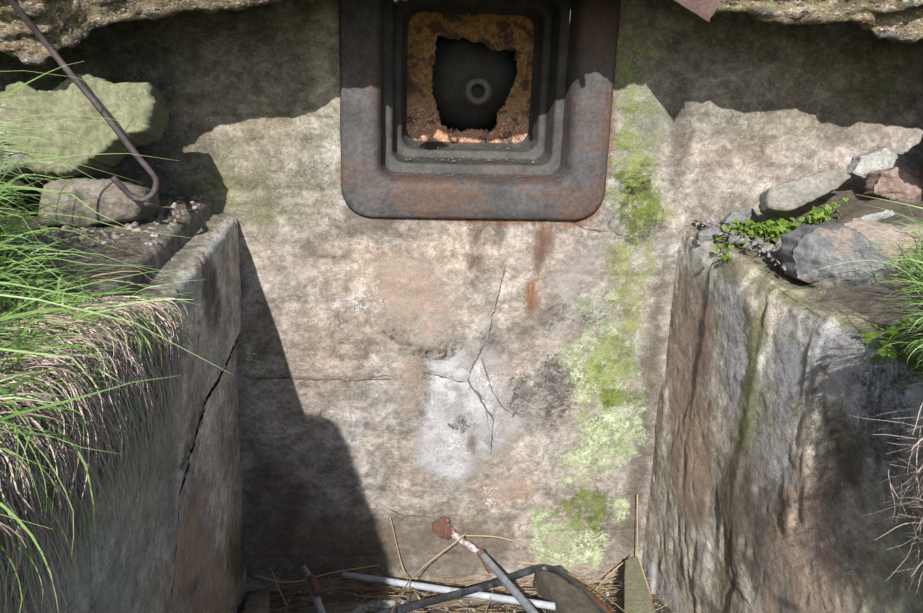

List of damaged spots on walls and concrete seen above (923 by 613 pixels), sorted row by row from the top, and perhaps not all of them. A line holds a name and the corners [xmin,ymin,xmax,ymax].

corrosion [475,220,549,262]
crack [175,286,243,559]
damp [426,361,502,477]
crack [422,265,511,455]